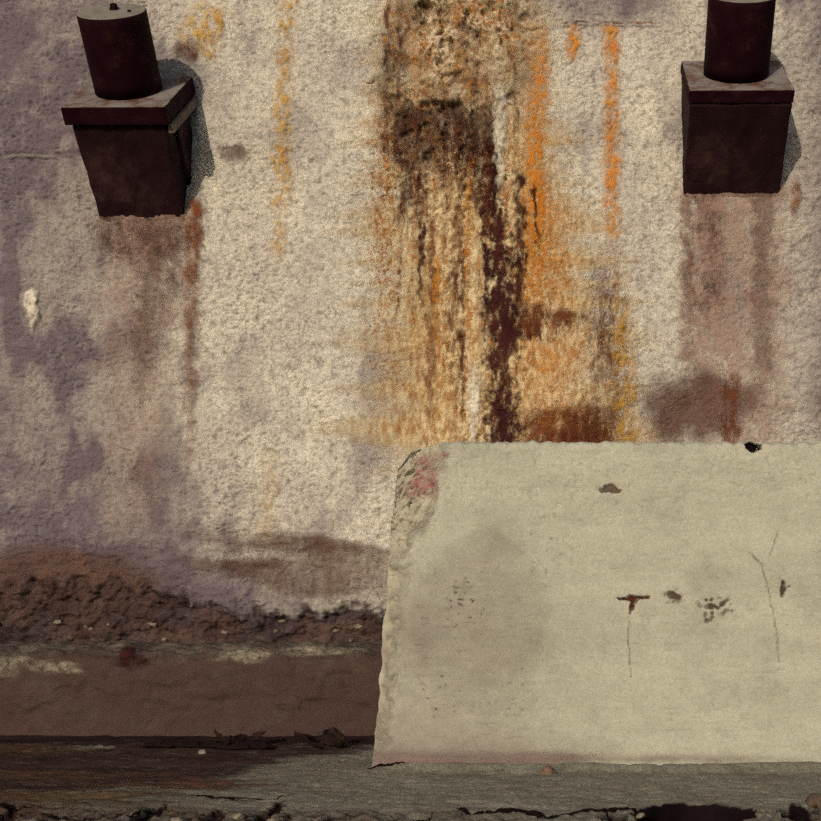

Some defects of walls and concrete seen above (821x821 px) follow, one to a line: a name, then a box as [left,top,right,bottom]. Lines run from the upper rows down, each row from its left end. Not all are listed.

rust [359,0,637,451]
damp [0,546,153,612]
damp [219,560,293,588]
damp [251,535,360,594]
spalling [601,803,816,821]